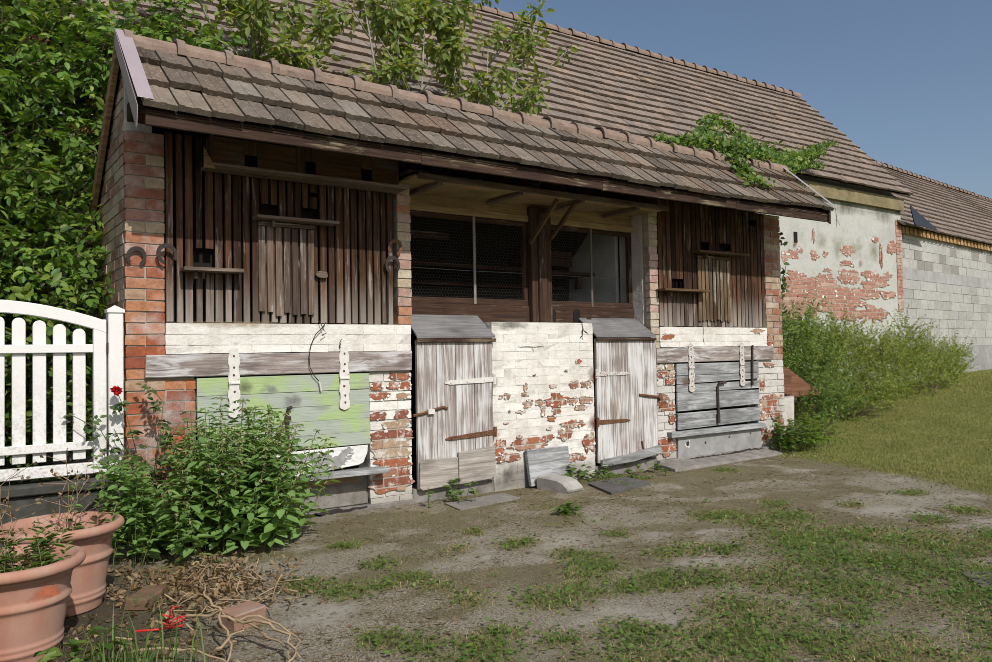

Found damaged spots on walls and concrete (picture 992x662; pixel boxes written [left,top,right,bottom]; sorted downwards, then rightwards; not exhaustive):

flaking render [781,228,897,322]
peeling [368,372,415,494]
peeling [494,359,596,463]
peeling [656,363,676,424]
peeling [658,437,690,457]
peeling [758,363,786,442]